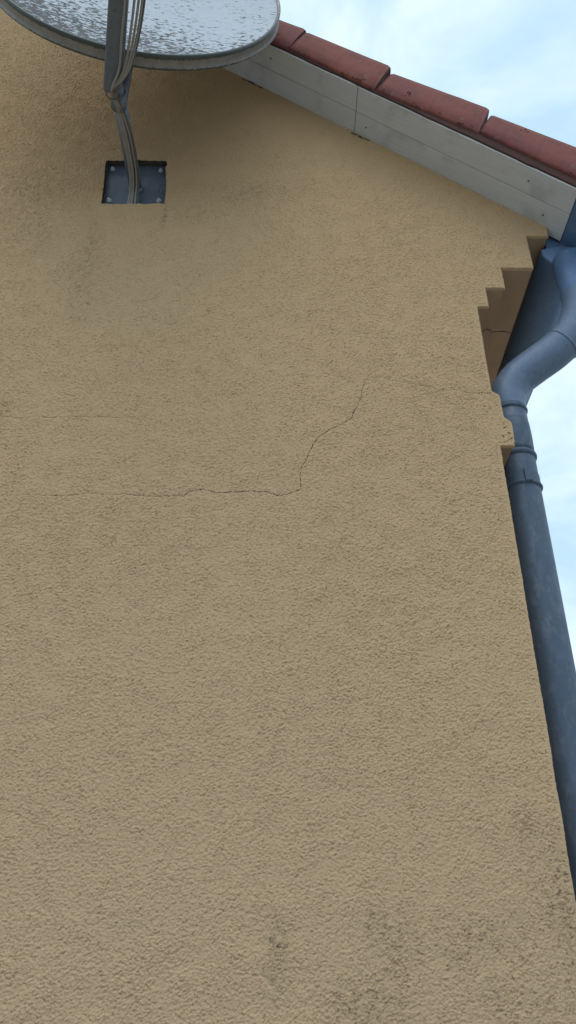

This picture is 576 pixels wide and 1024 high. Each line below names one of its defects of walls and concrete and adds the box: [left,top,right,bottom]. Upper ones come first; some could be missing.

crack [82,366,491,497]